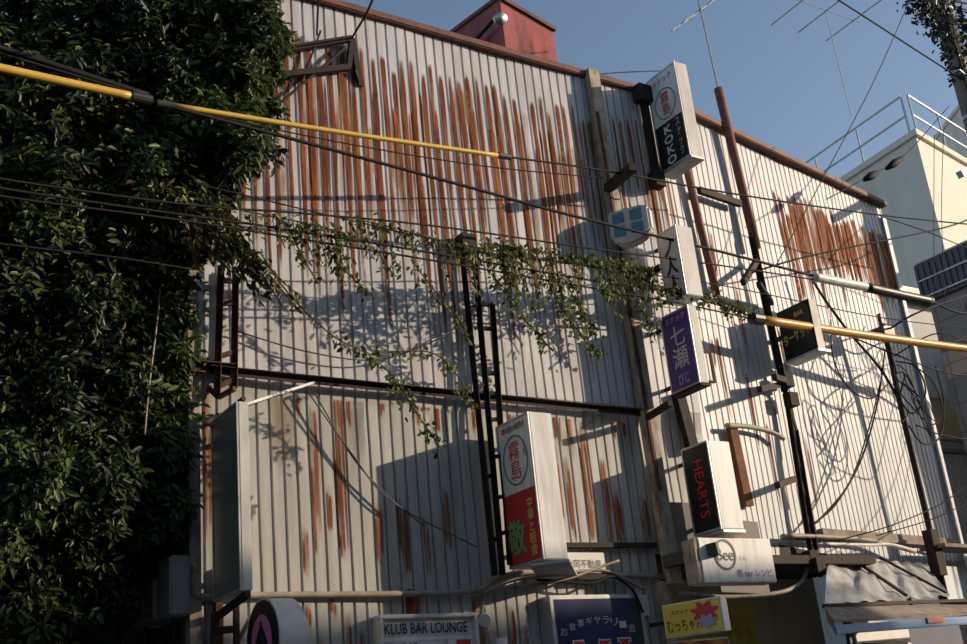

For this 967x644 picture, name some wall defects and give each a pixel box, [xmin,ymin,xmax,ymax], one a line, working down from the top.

rust [241,33,610,360]
rust [773,191,900,311]
rust [417,406,450,430]
rust [304,399,351,570]
rust [397,500,411,571]
rust [552,417,595,540]
rust [601,462,626,542]
rust [401,589,420,614]